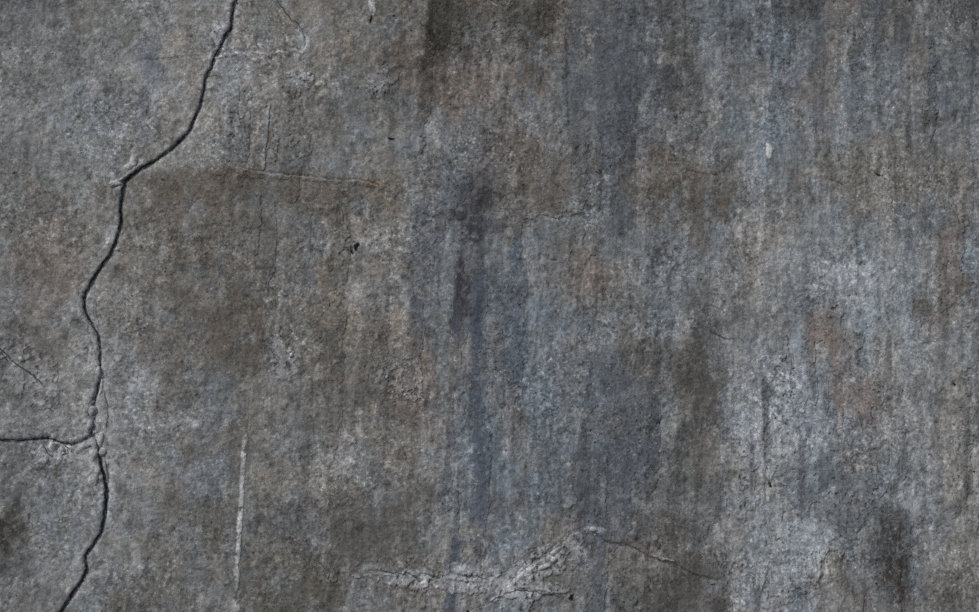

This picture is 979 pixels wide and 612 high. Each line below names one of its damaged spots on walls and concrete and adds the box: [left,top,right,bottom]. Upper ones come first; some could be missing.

crack [0,0,236,612]
crack [278,1,305,52]
damp [97,0,755,612]